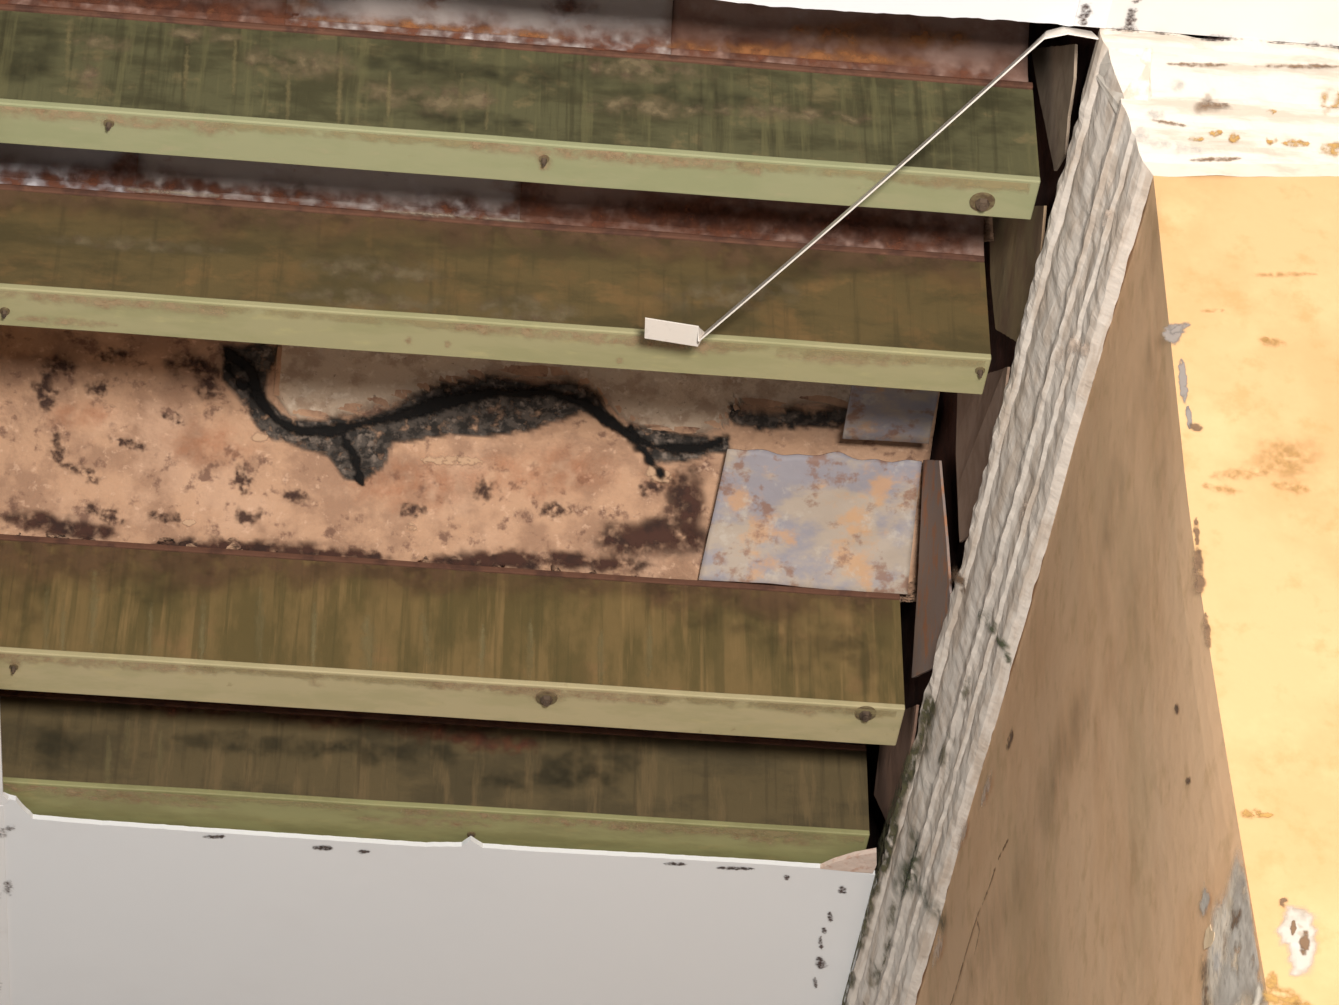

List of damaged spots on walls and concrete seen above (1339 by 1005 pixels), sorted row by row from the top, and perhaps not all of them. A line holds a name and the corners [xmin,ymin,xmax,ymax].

rust [0,0,714,85]
rust [0,154,965,254]
crack [223,348,724,486]
spalling [167,343,852,496]
rust [5,512,114,540]
spalling [237,511,261,523]
rust [162,538,371,558]
rust [432,475,707,572]
water stain [842,696,945,1005]
water stain [814,912,833,988]
peeling [1200,859,1268,1005]
peeling [1277,898,1317,976]